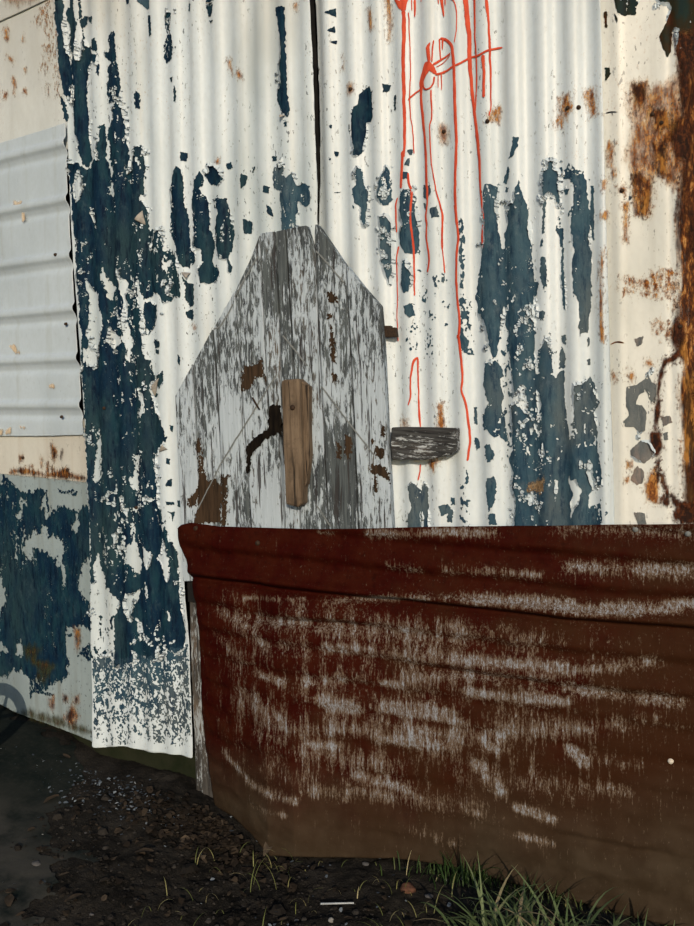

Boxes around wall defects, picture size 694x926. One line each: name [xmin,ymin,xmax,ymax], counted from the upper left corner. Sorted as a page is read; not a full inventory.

peeling [274,6,290,127]
peeling [604,0,640,28]
peeling [652,0,694,67]
peeling [263,156,311,230]
peeling [348,85,608,527]
peeling [0,0,255,746]
corrosion [9,442,86,482]
peeling [335,434,353,460]
corrosion [178,33,694,926]